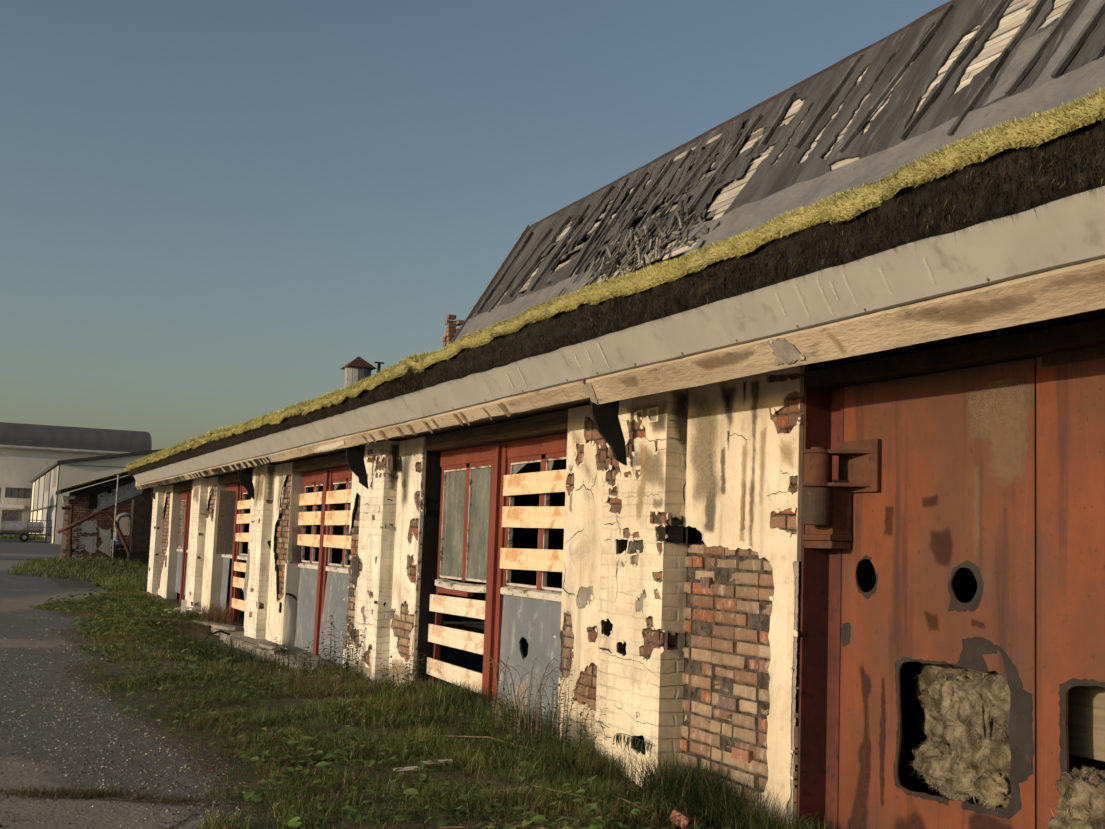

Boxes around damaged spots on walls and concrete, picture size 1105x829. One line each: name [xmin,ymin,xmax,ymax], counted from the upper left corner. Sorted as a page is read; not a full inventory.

flaking render [566,382,658,514]
leakage [631,381,758,538]
leakage [697,351,751,368]
flaking render [766,338,805,434]
flaking render [242,549,264,618]
flaking render [266,476,293,613]
flaking render [343,496,414,666]
flaking render [406,491,426,585]
flaking render [617,529,640,567]
flaking render [553,586,626,710]
flaking render [636,509,774,809]
crack [0,791,216,829]